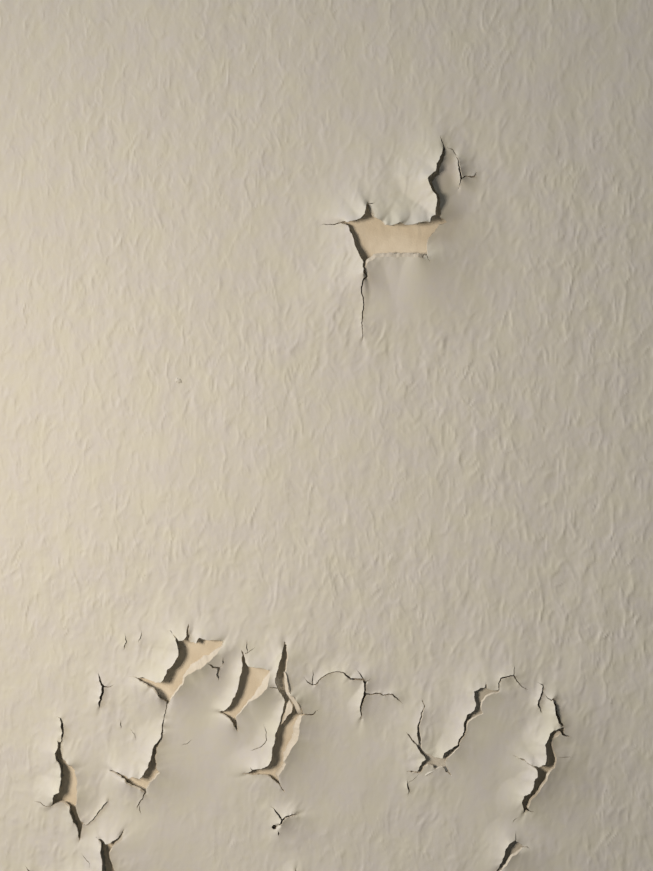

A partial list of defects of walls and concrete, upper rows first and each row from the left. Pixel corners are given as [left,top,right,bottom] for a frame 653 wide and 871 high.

peeling [257,72,531,380]
crack [251,803,327,858]
peeling [0,562,619,871]
crack [304,647,410,750]